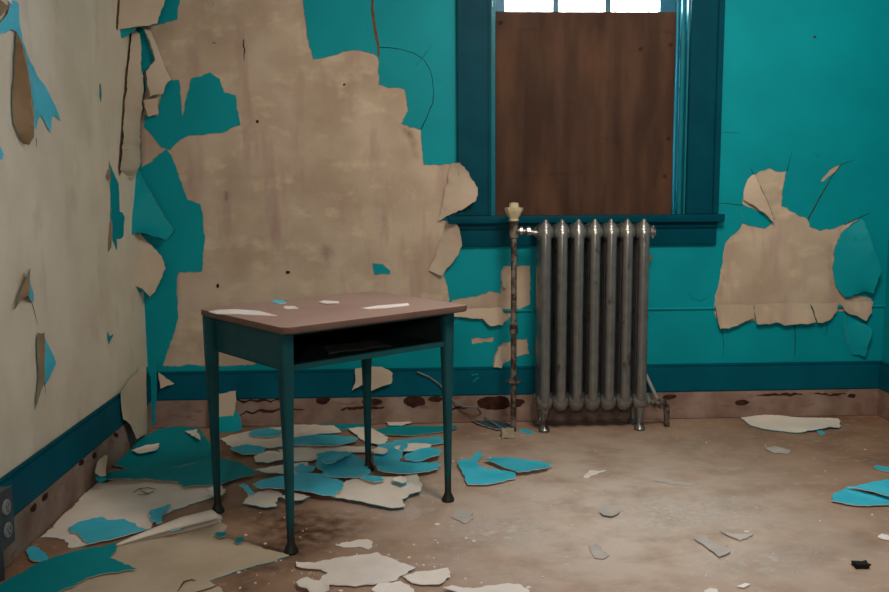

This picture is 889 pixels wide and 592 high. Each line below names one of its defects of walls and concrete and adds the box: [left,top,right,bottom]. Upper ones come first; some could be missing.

crack [371,0,434,130]
peeling [0,0,531,592]
peeling [714,168,881,356]
crack [808,160,854,220]